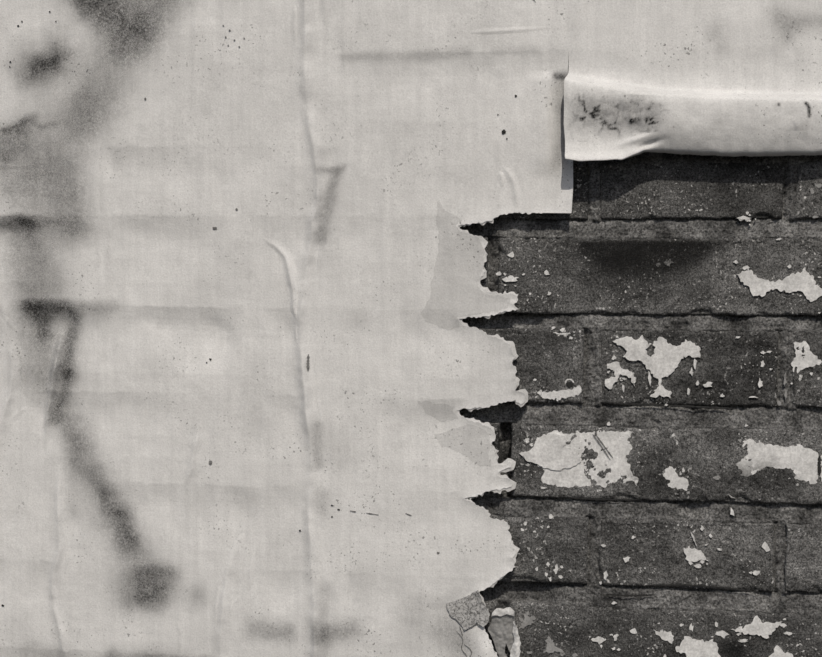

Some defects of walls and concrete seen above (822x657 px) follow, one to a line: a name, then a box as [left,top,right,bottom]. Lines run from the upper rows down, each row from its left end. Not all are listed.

peeling [496,271,525,287]
peeling [734,260,822,302]
peeling [535,379,582,401]
peeling [605,335,712,406]
peeling [777,341,822,406]
peeling [519,422,638,489]
peeling [658,466,690,494]
peeling [736,438,822,486]
peeling [684,525,713,568]
peeling [543,636,578,657]
peeling [589,634,621,651]
peeling [654,616,793,657]